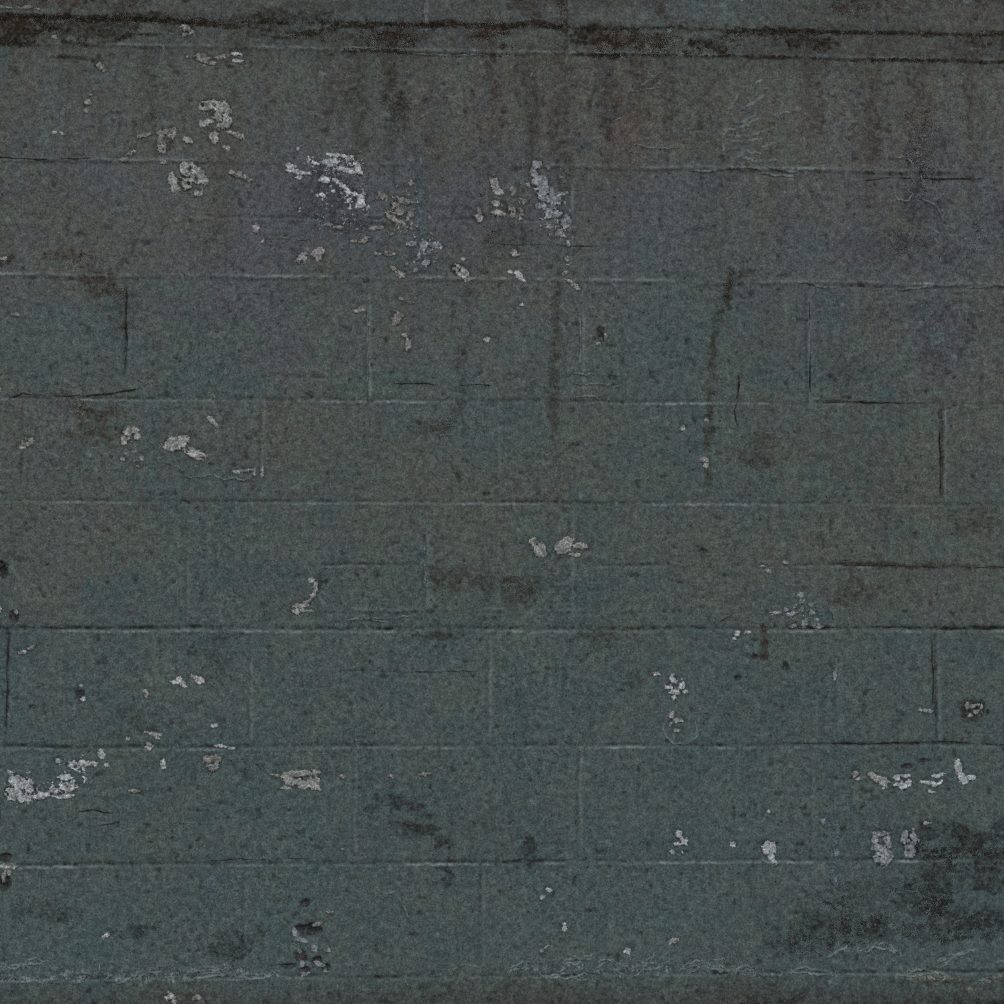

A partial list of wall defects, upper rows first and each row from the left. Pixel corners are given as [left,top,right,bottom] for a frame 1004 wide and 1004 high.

peeling [196,93,245,152]
peeling [118,127,209,197]
peeling [285,145,446,280]
peeling [473,160,581,291]
peeling [120,425,145,468]
peeling [163,435,208,461]
peeling [529,536,588,558]
peeling [650,672,688,732]
peeling [4,748,109,808]
peeling [852,758,976,794]
peeling [871,820,932,867]
spalling [282,910,334,977]